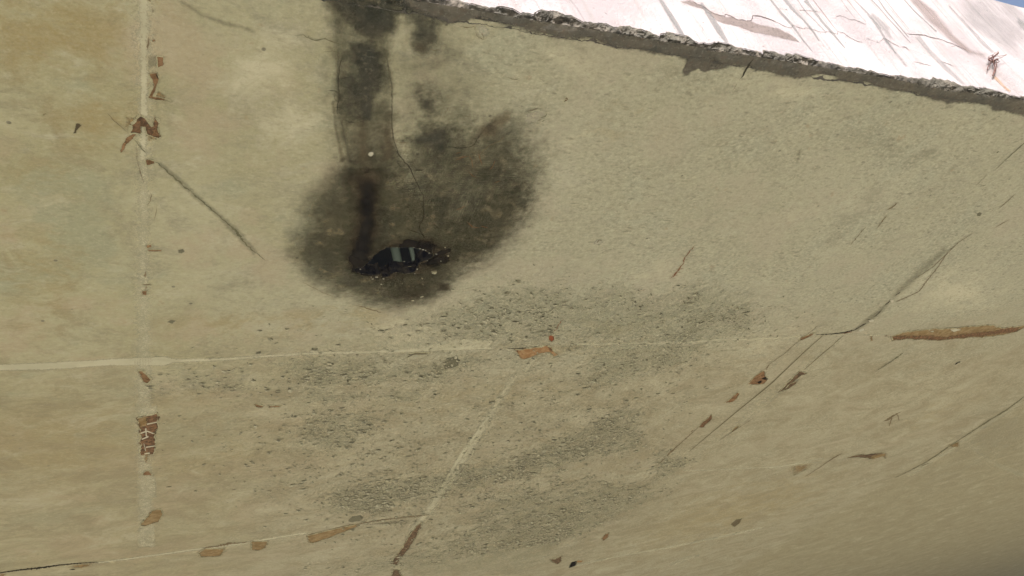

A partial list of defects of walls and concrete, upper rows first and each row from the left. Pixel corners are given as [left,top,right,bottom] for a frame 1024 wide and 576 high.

rust [147,37,173,102]
spalling [321,0,1024,106]
rust [120,114,161,152]
crack [107,113,263,259]
water stain [300,0,1024,305]
rust [509,321,561,359]
rust [888,325,1024,341]
rust [136,412,160,476]
spalling [147,247,813,558]
crack [658,327,854,465]
crack [895,397,1024,478]
rust [140,509,164,526]